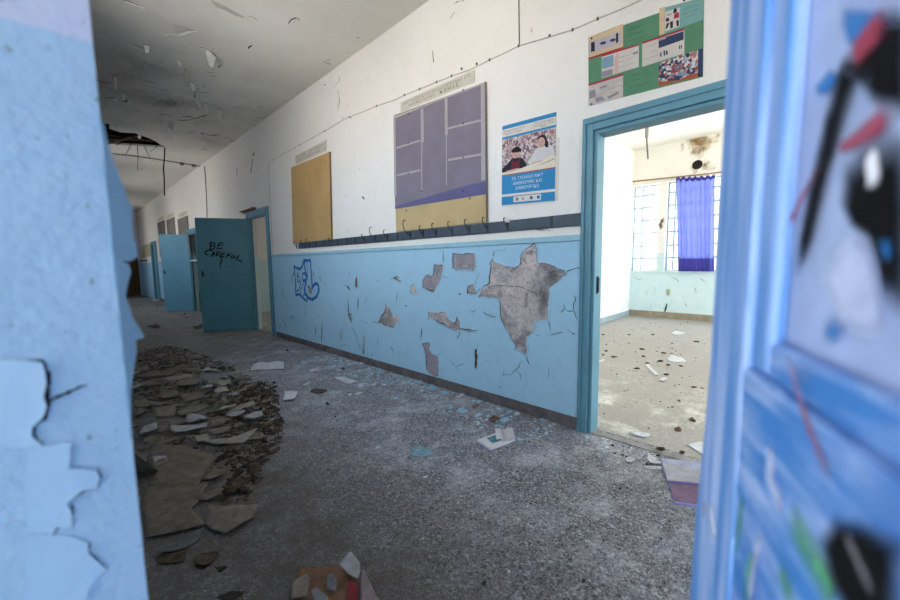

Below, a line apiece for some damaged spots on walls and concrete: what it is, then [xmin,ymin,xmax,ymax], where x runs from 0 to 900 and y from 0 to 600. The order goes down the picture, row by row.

peeling [205,50,216,68]
peeling [98,116,144,439]
peeling [372,302,400,329]
peeling [390,243,580,365]
crack [489,285,577,335]
peeling [421,341,443,377]
peeling [0,359,106,600]